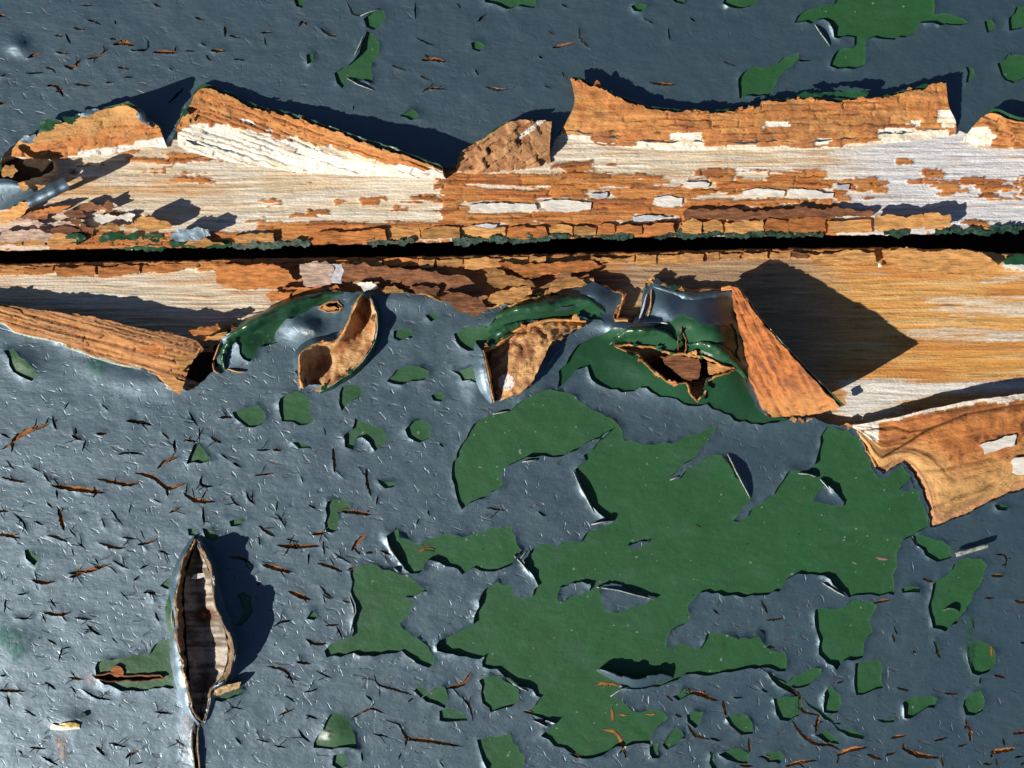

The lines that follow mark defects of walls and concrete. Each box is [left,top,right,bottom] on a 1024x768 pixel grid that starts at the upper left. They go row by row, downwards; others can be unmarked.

peeling [794,0,968,69]
peeling [470,192,608,229]
peeling [633,181,710,222]
peeling [743,184,850,199]
peeling [236,290,332,362]
peeling [3,349,38,381]
peeling [278,391,313,426]
peeling [980,435,1024,475]
peeling [324,305,988,759]
crack [0,402,435,768]
peeling [95,639,174,692]
peeling [477,734,525,768]